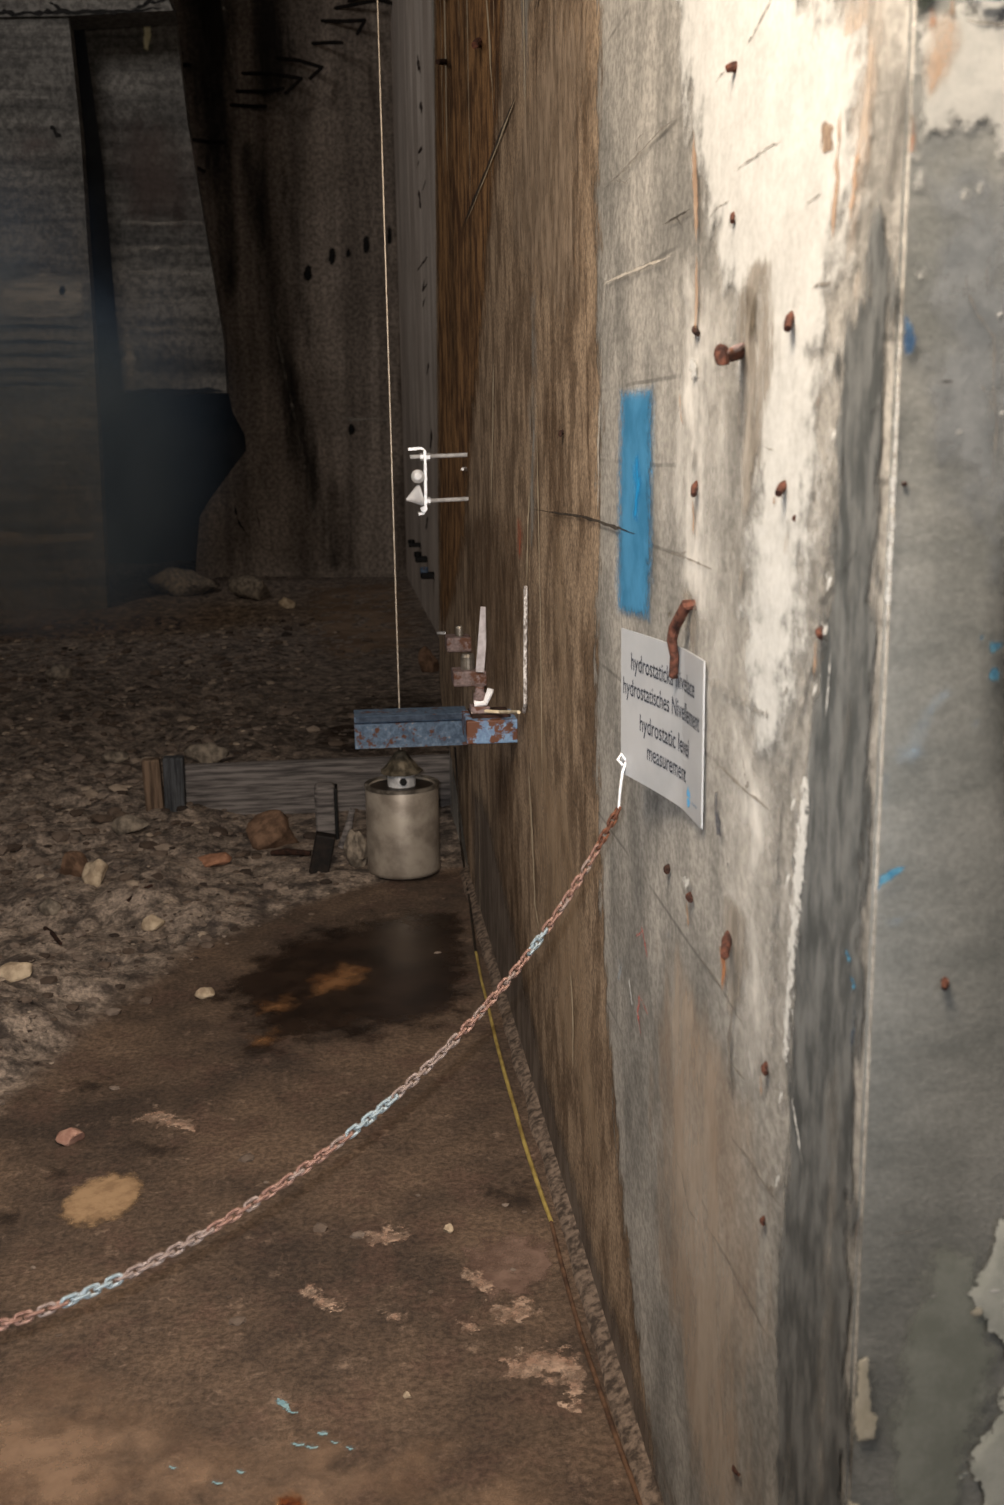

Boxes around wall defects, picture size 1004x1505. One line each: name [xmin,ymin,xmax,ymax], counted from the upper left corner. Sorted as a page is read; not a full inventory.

damp [282,356,317,503]
damp [307,0,656,1479]
peeling [968,1219,1004,1343]
damp [0,1419,153,1505]
peeling [959,1386,1004,1505]